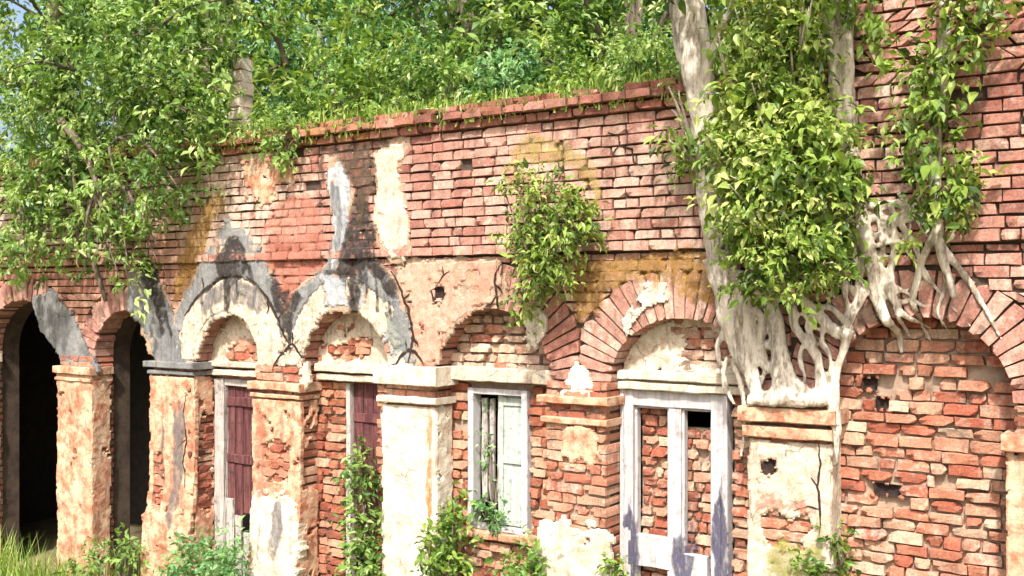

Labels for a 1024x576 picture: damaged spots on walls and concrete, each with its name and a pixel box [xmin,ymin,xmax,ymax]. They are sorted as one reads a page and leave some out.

water stain [136,260,182,336]
water stain [199,138,406,356]
flaking render [125,136,508,390]
crack [388,271,423,367]
flaking render [622,281,669,336]
spalling [152,452,165,499]
spalling [188,416,215,504]
spalling [259,439,296,482]
flaking render [561,425,602,467]
spalling [760,456,778,477]
crack [794,441,822,536]
spalling [760,516,810,553]